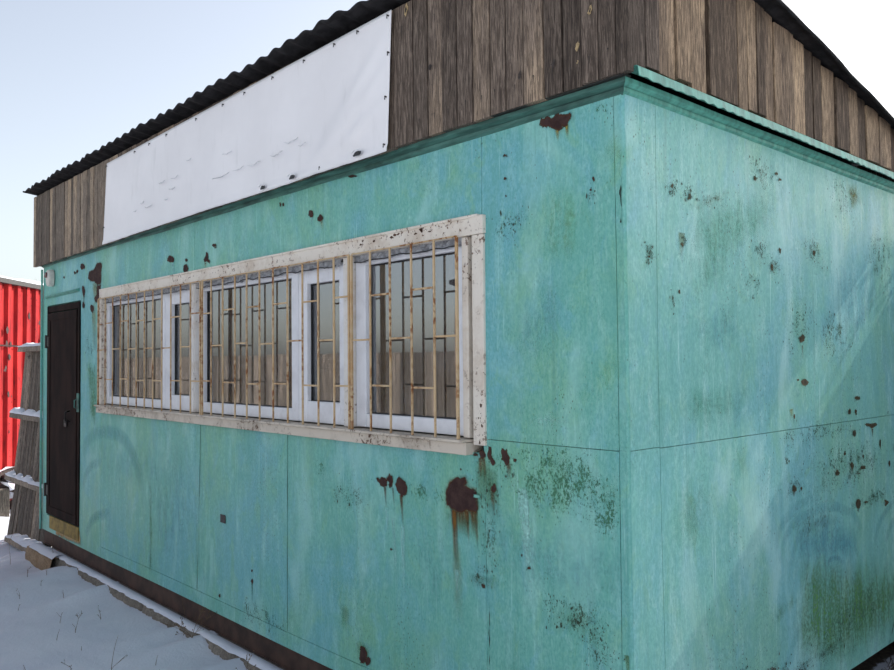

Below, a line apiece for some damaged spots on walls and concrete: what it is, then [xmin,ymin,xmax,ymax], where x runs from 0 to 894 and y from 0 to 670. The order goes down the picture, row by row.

rust [539,113,571,134]
rust [63,263,102,313]
rust [473,447,516,468]
rust [376,474,407,508]
rust [446,468,478,544]
rust [359,646,371,666]